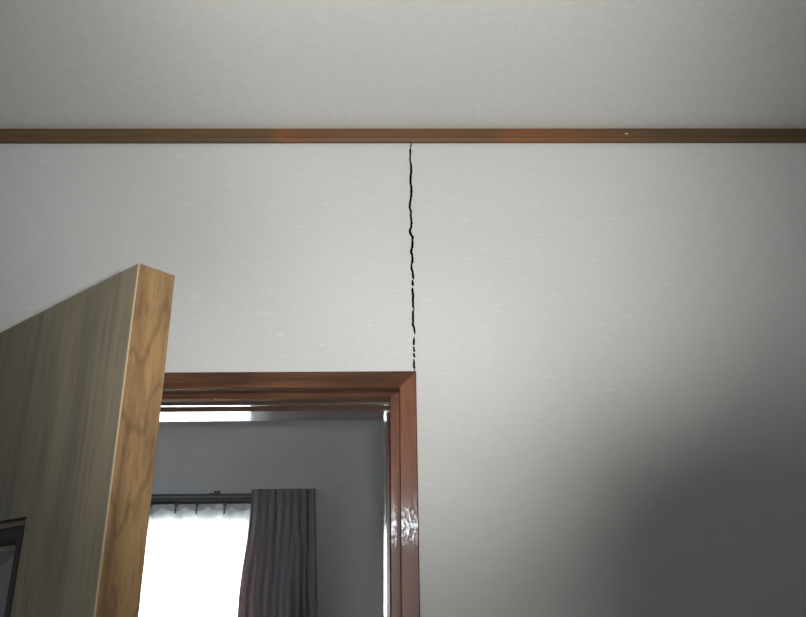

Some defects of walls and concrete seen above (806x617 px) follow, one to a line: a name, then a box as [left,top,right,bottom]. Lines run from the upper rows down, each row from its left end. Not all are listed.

crack [408,143,416,371]